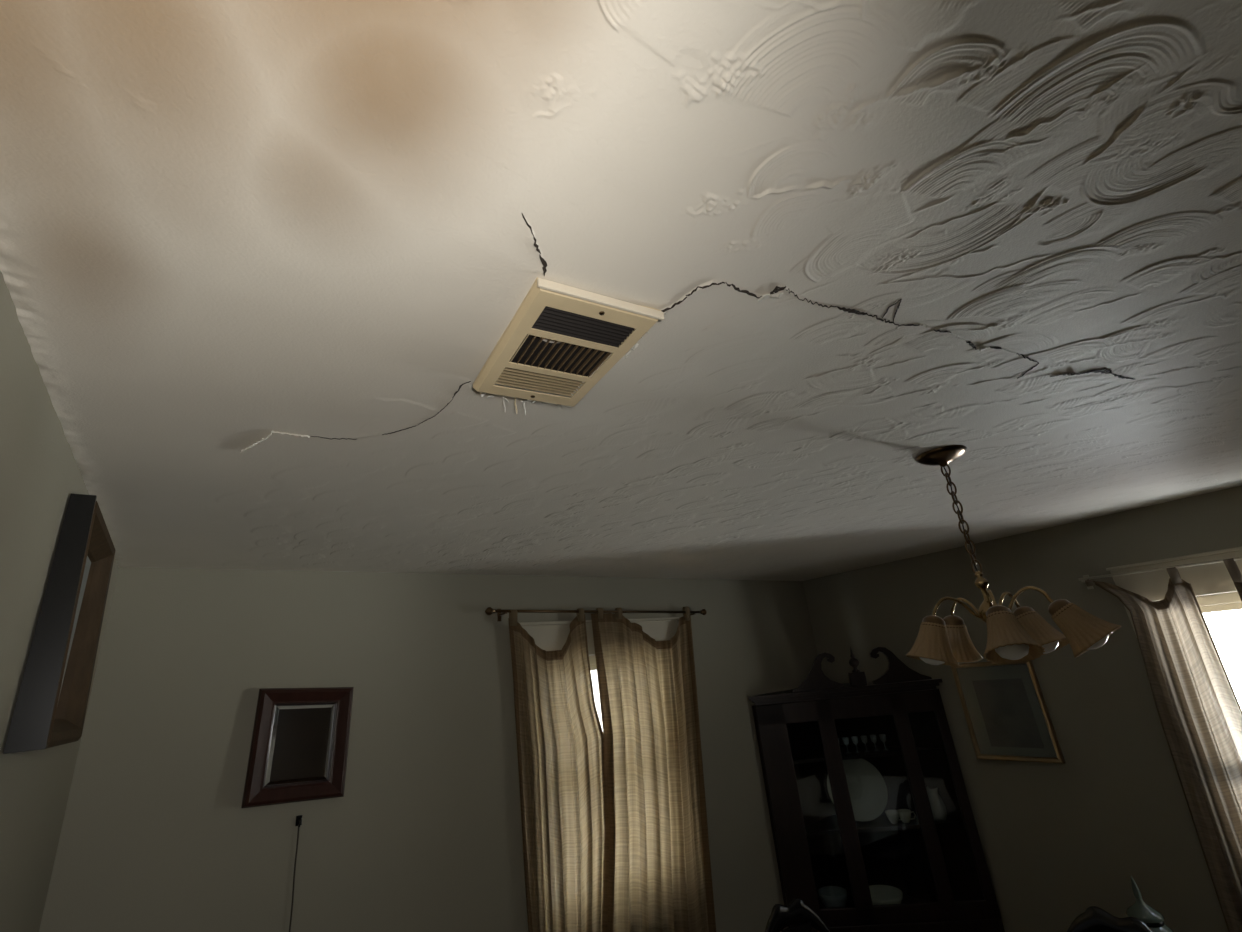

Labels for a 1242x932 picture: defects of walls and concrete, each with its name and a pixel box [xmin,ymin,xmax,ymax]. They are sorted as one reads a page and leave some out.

crack [661,282,1136,380]
peeling [241,431,310,452]